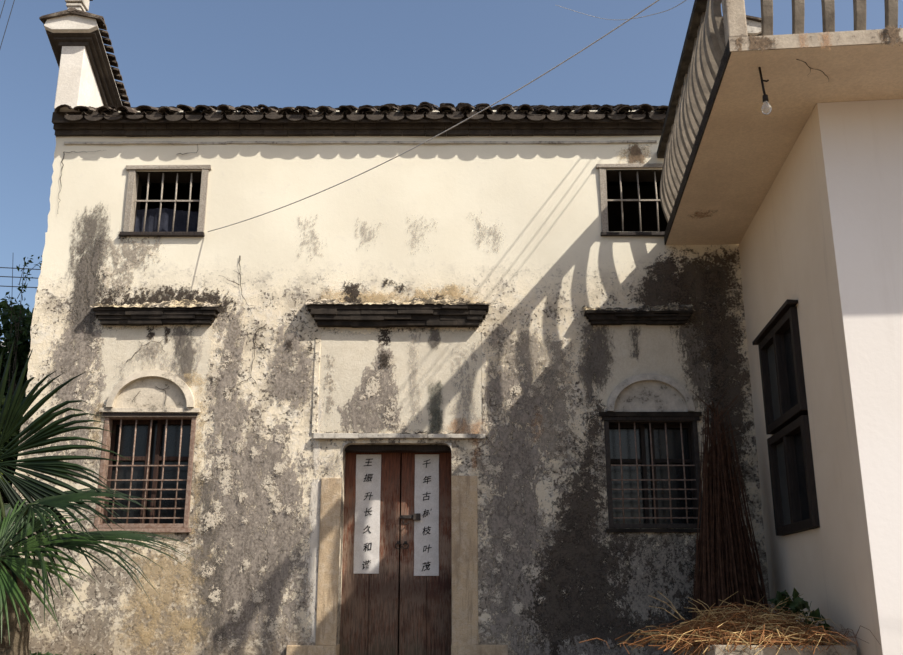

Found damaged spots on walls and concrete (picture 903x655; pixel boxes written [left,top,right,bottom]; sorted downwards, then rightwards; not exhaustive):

leakage [67,205,237,342]
leakage [318,275,365,303]
flaking render [259,321,410,433]
leakage [377,327,394,346]
leakage [428,327,441,349]
leakage [427,382,443,433]
leakage [578,325,613,403]
leakage [629,328,640,359]
leakage [671,320,713,413]
flaking render [189,298,313,655]